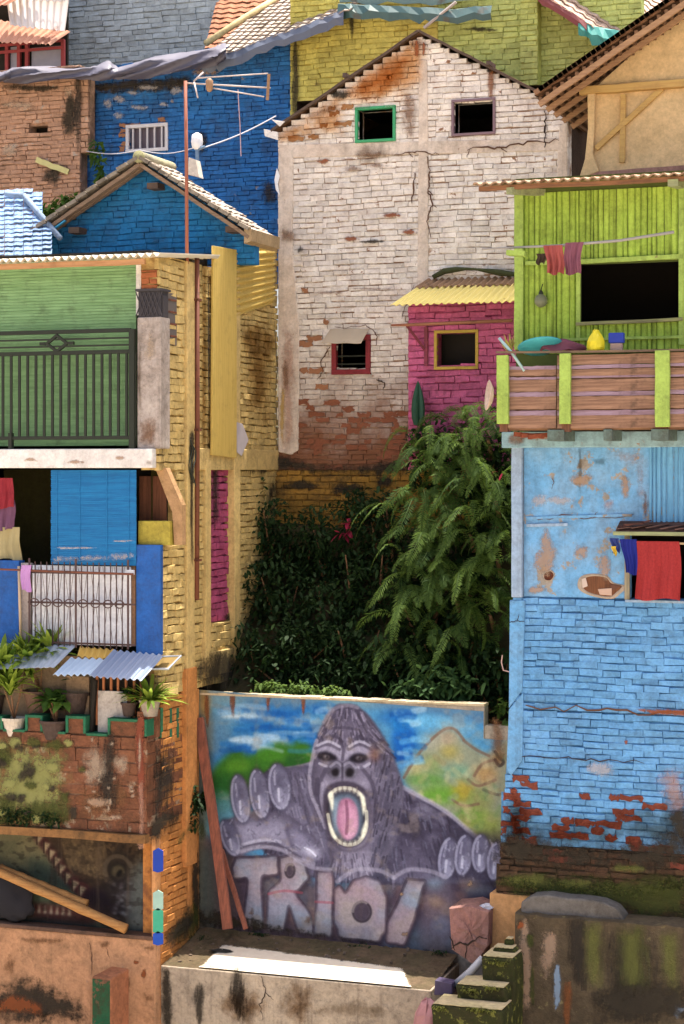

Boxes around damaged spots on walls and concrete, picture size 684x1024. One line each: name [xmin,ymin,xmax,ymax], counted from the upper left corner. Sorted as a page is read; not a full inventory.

crack [467,110,558,155]
crack [395,151,439,238]
crack [317,324,378,379]
flaking render [280,362,408,470]
peeling [529,533,556,593]
spalling [578,556,624,599]
crack [526,705,656,716]
leakage [5,793,31,815]
flaking render [500,775,669,863]
leakage [161,969,172,1024]
leakage [194,986,204,1024]
leakage [230,967,247,1020]